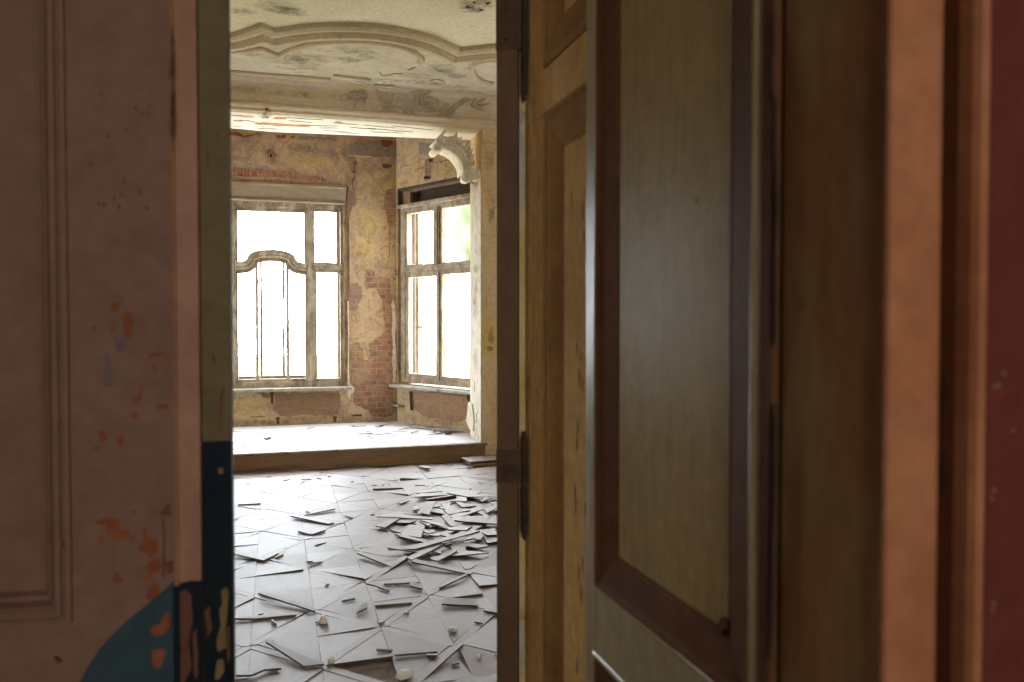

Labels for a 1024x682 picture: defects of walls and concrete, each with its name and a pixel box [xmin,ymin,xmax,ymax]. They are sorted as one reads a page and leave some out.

spalling [276,134,337,142]
spalling [348,140,397,159]
spalling [383,189,396,228]
spalling [260,269,397,418]
spalling [412,390,468,423]